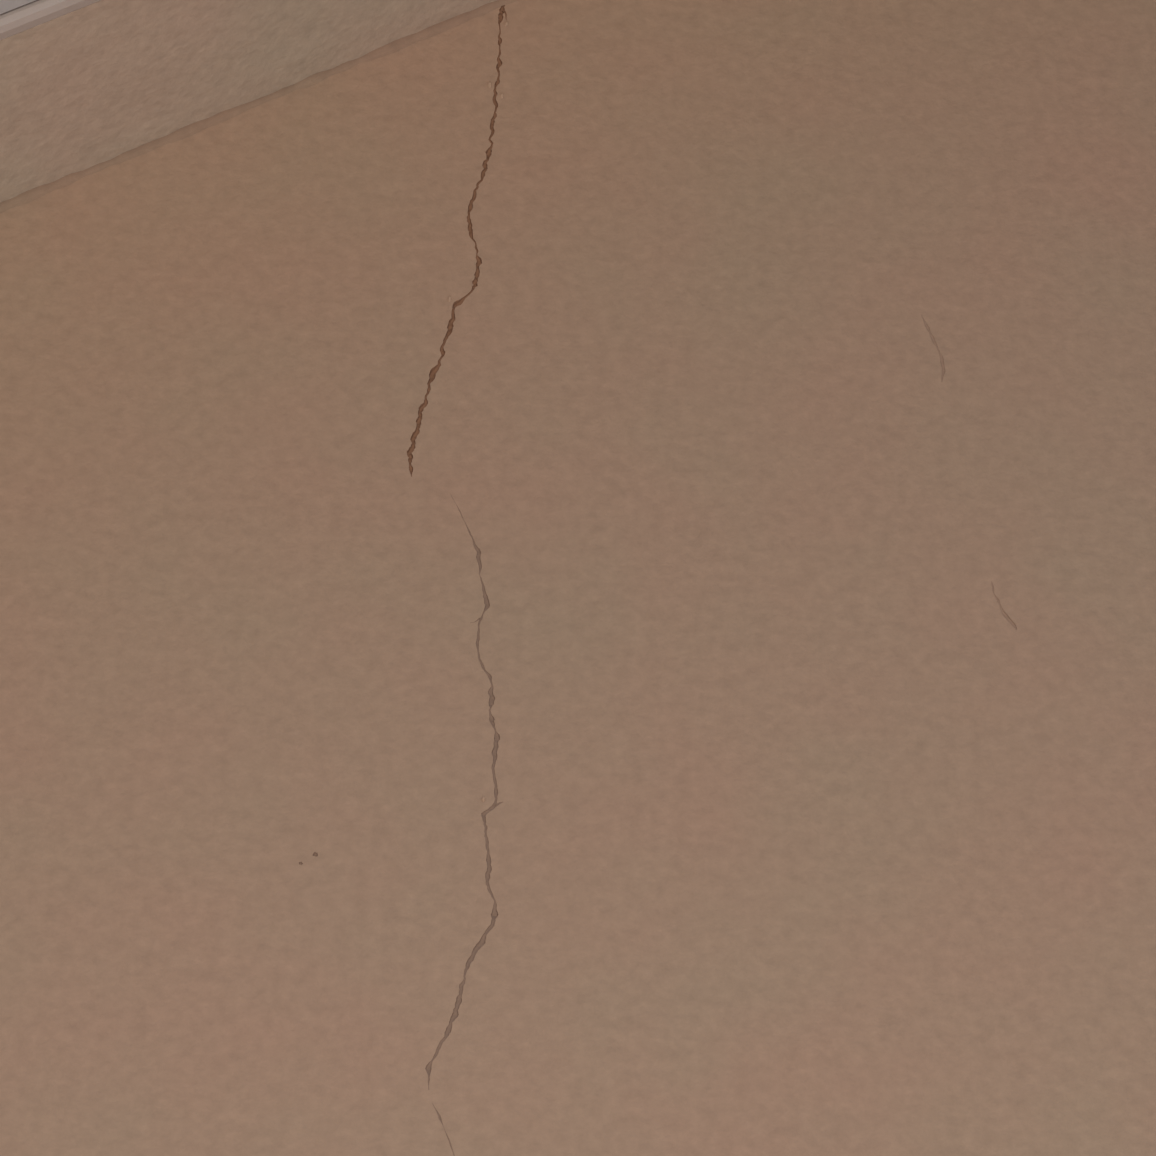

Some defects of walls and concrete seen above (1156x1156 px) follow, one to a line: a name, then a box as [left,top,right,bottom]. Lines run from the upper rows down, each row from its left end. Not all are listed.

crack [407,5,508,477]
crack [425,497,503,1156]